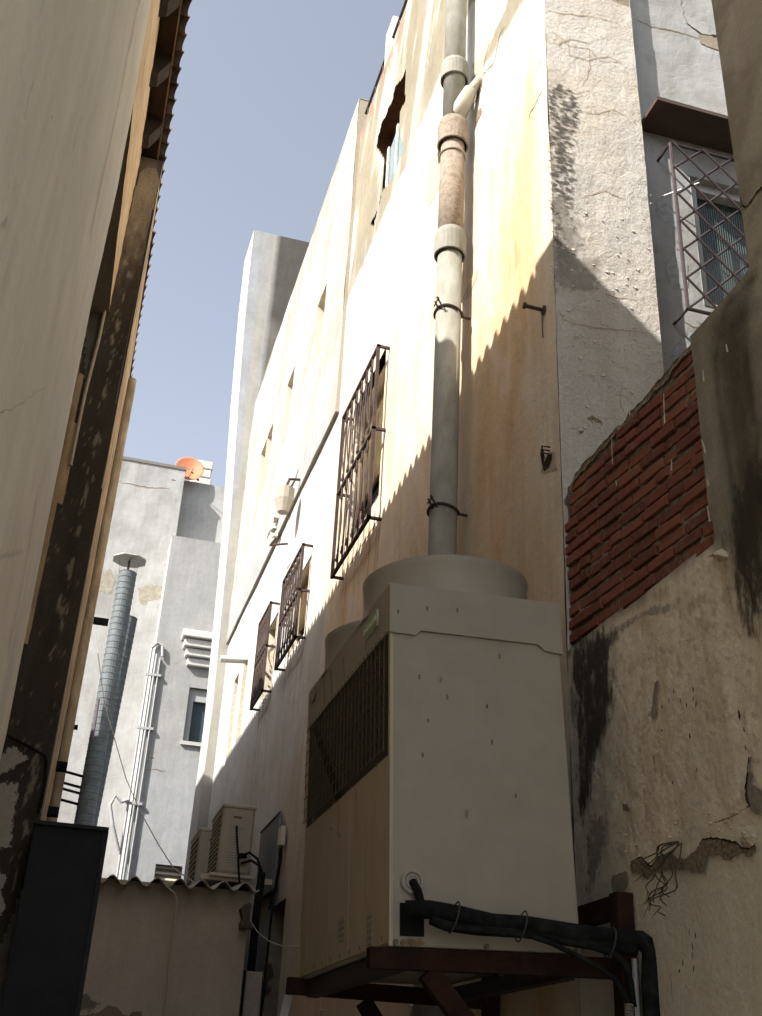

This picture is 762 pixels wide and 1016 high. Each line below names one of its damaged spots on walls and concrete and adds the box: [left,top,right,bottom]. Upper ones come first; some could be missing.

crack [528,0,719,122]
mould [543,84,599,290]
leakage [717,307,762,638]
peeling [0,746,28,850]
leakage [569,604,669,891]
flaking render [611,746,762,892]
peeling [0,873,8,916]